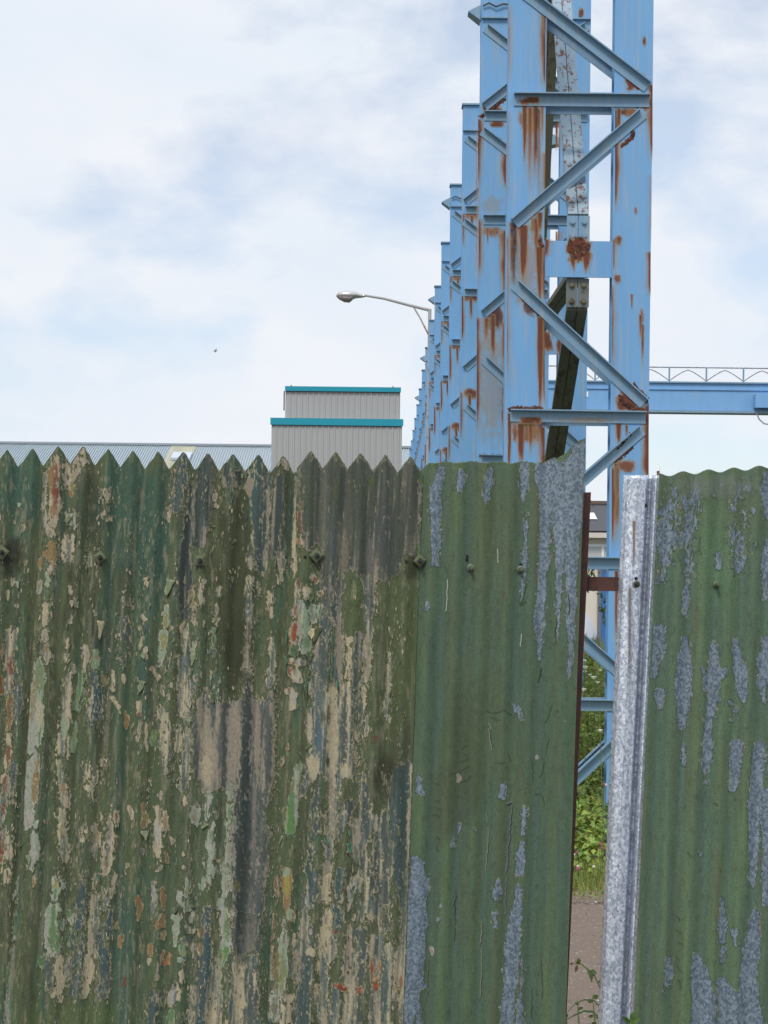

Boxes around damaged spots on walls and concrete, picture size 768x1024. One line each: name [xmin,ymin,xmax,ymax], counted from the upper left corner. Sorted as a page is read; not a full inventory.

corrosion [615,79,653,158]
corrosion [414,97,592,469]
corrosion [612,236,622,357]
corrosion [631,294,644,358]
peeling [426,463,469,568]
peeling [481,466,496,505]
peeling [517,441,585,680]
corrosion [612,391,649,540]
peeling [654,470,768,618]
peeling [0,447,443,1024]
peeling [649,622,768,1024]
peeling [490,805,530,1024]